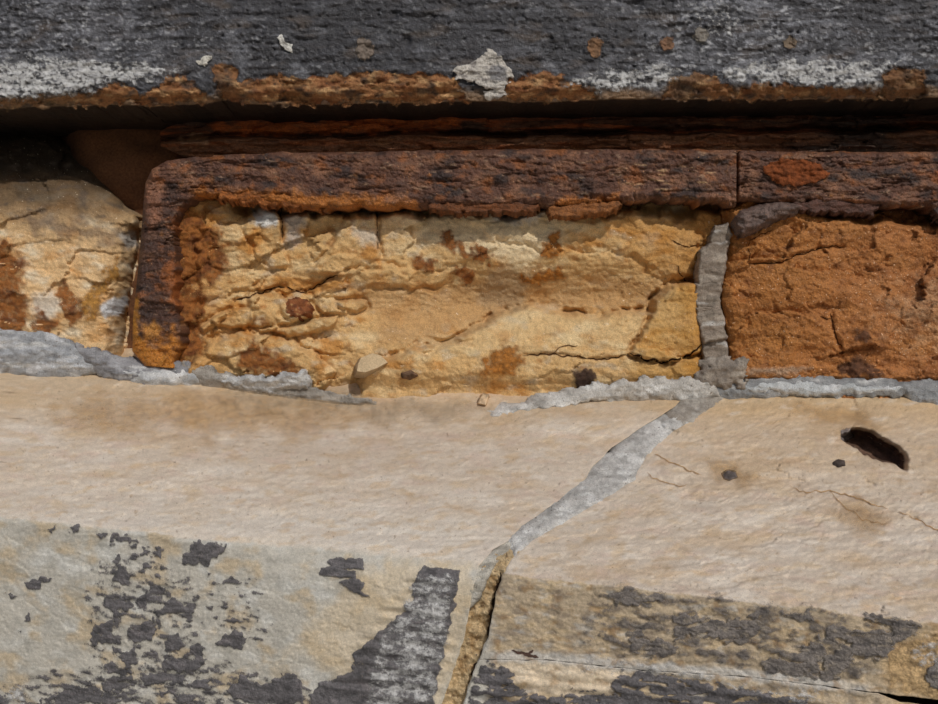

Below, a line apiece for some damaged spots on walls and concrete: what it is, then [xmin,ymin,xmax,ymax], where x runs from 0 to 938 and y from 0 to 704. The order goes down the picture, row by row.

leakage [0,55,177,99]
spalling [0,49,596,110]
leakage [564,63,681,94]
leakage [723,59,901,90]
corrosion [428,200,623,286]
corrosion [730,199,880,240]
corrosion [0,239,120,332]
peeling [0,533,460,704]
crack [470,572,502,676]
crack [512,650,539,658]
peeling [468,586,938,704]
crack [891,696,938,704]